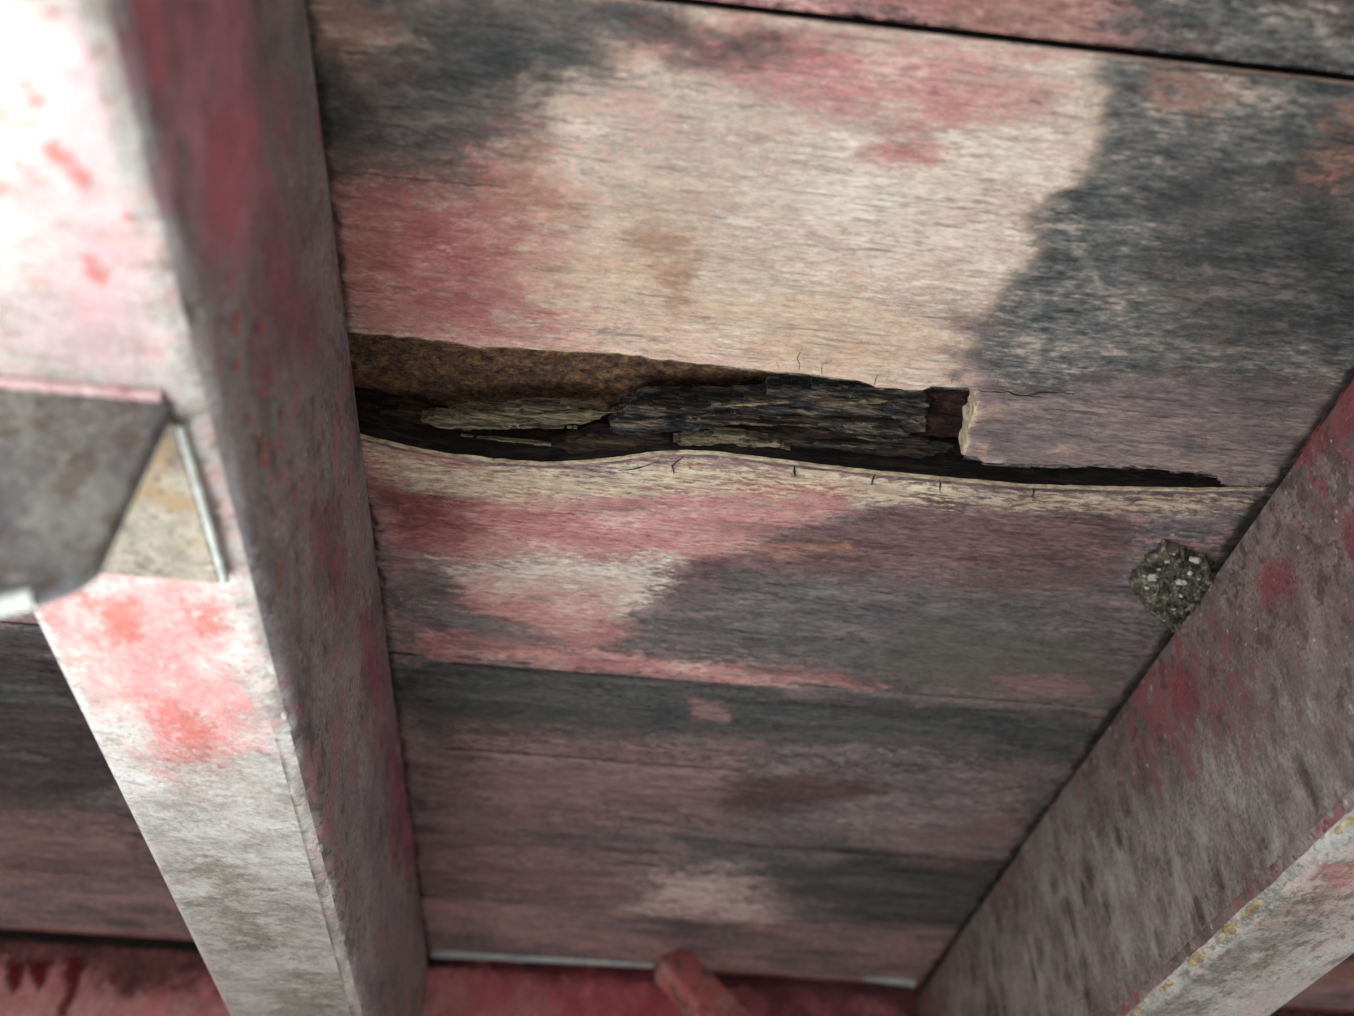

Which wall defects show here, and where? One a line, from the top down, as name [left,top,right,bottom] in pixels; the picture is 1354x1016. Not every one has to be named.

leakage [305,0,783,338]
leakage [945,0,1354,576]
crack [951,376,1075,398]
crack [618,456,683,474]
leakage [6,956,86,1016]